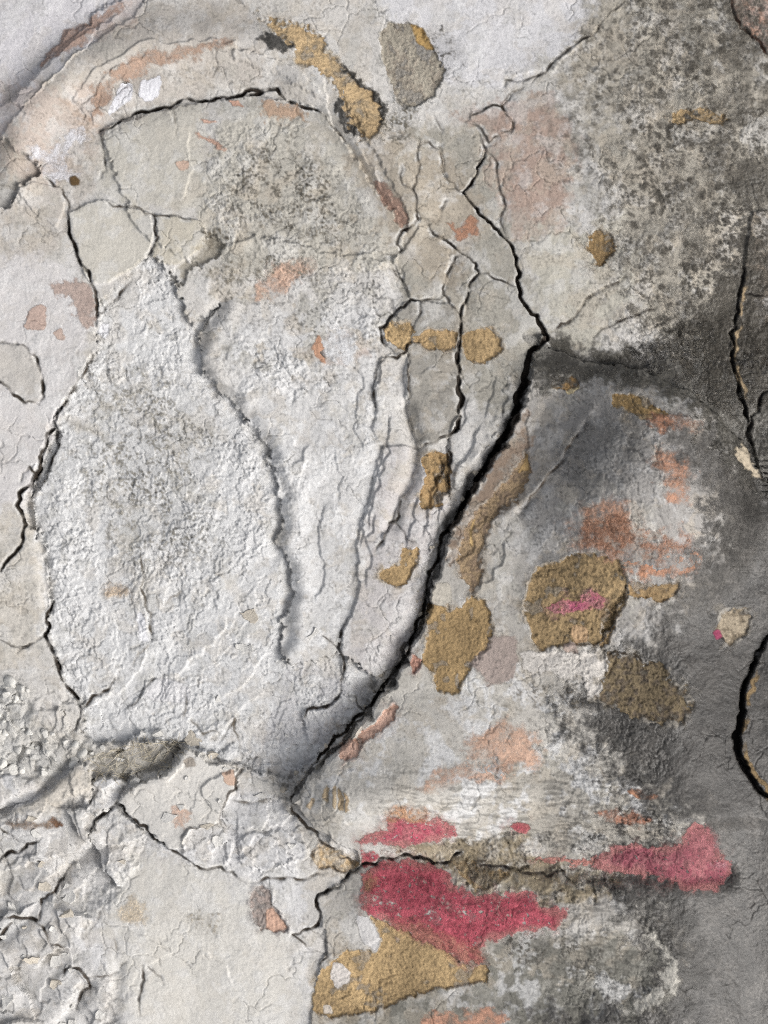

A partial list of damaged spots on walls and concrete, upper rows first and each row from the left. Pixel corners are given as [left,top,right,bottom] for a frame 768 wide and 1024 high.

crack [112,88,345,141]
spalling [262,17,385,144]
spalling [378,21,446,109]
crack [49,180,127,317]
crack [0,344,93,571]
crack [10,602,115,706]
spalling [0,257,399,794]
crack [224,26,599,962]
spalling [410,450,702,727]
water stain [517,0,768,1024]
crack [731,637,768,798]
spalling [312,915,489,1019]